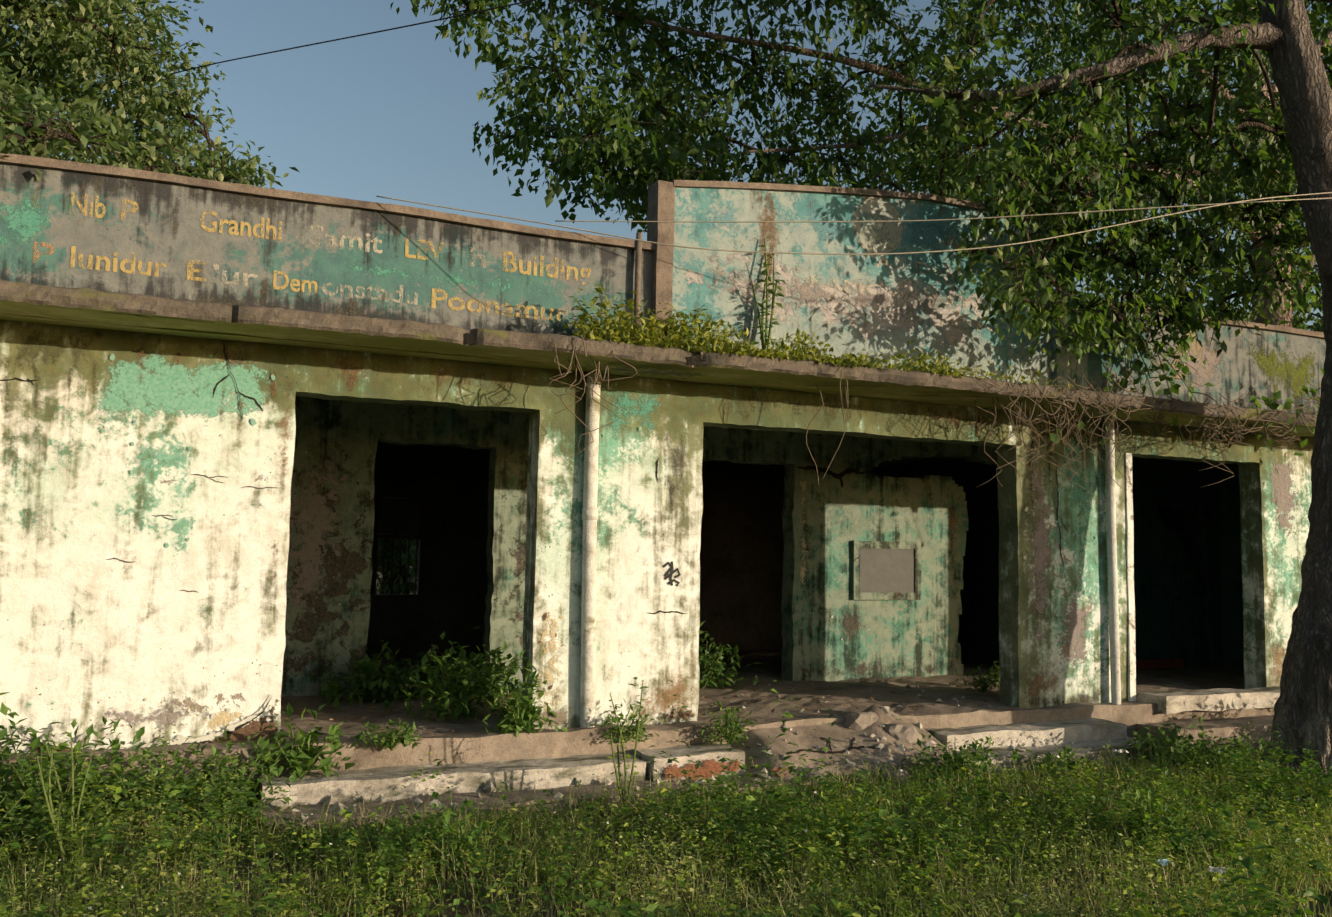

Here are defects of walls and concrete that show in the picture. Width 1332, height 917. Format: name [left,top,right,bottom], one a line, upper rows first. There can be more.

peeling [808,208,847,242]
peeling [909,222,961,254]
peeling [708,254,964,326]
crack [103,312,263,419]
peeling [95,354,275,426]
peeling [126,442,191,474]
water stain [665,438,686,506]
crack [797,465,872,488]
peeling [1056,590,1100,671]
spalling [25,694,279,753]
spalling [660,705,694,724]